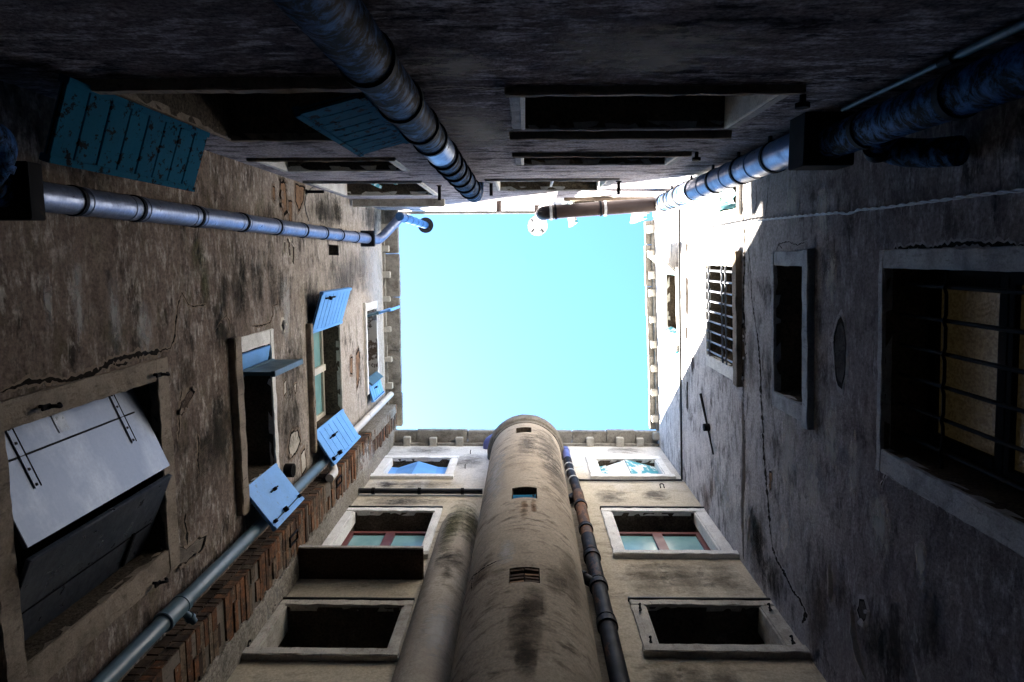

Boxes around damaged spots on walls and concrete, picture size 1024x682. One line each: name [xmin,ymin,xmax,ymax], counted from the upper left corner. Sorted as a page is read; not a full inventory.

peeling [271,177,305,221]
crack [0,292,206,394]
crack [741,185,809,625]
peeling [287,426,307,477]
damp [512,592,544,668]